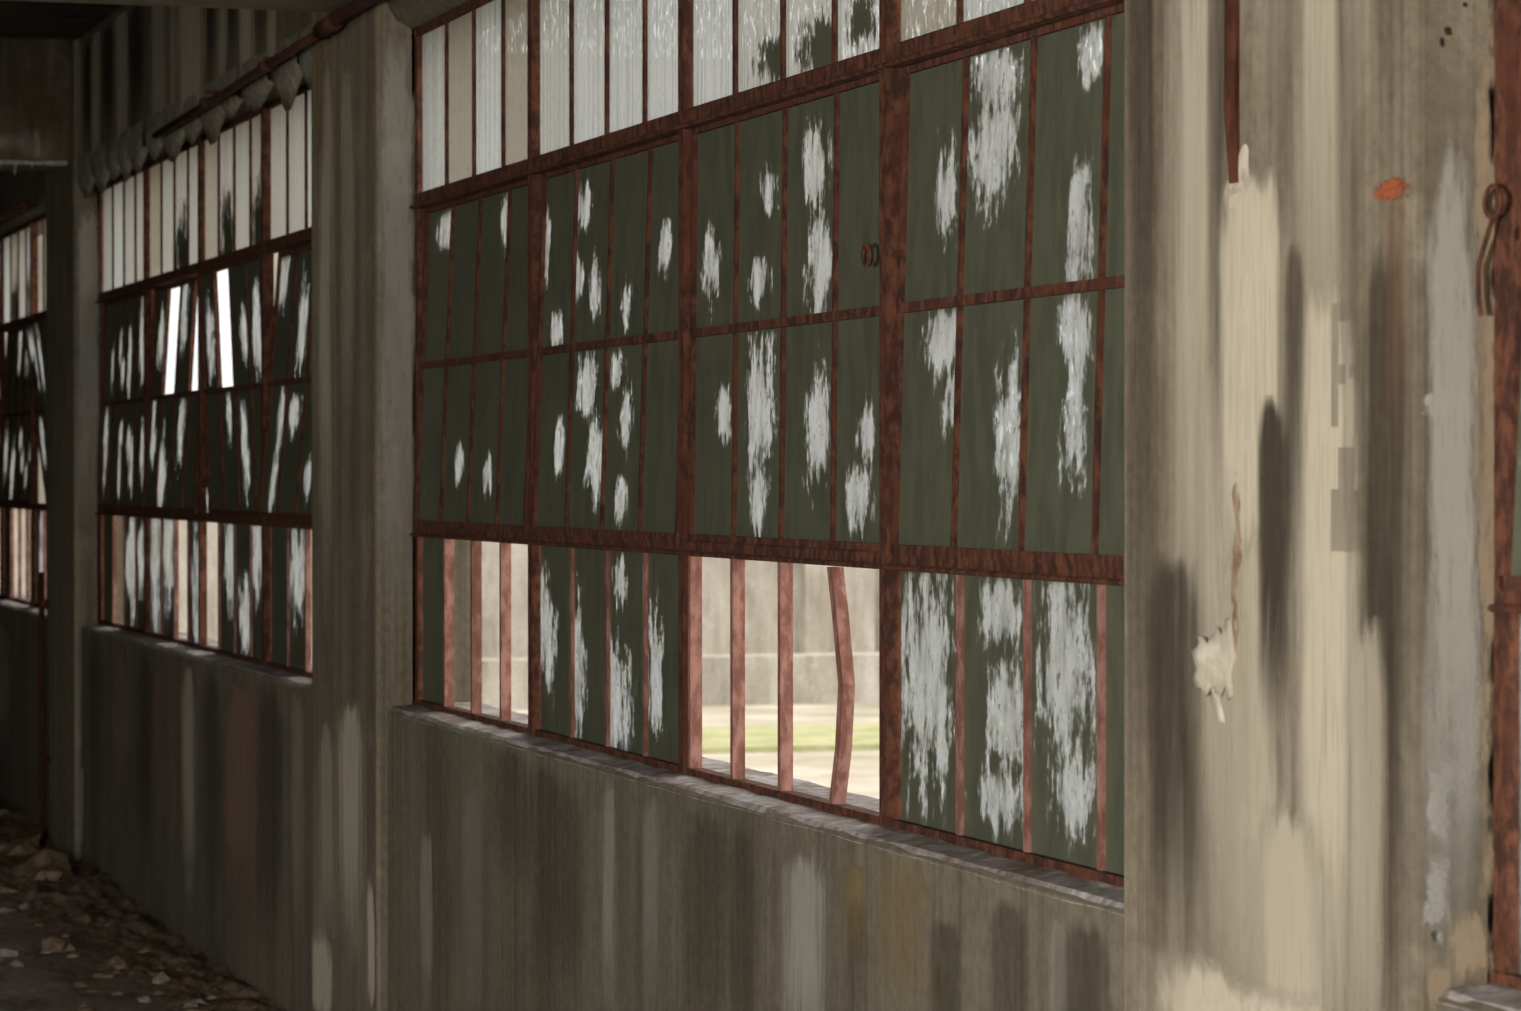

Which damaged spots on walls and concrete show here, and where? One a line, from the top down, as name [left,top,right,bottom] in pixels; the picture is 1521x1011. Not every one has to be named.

damp [0,5,276,166]
damp [319,63,353,510]
damp [1131,0,1149,324]
rust [1374,178,1409,202]
damp [1152,0,1402,1011]
damp [1424,147,1481,837]
damp [181,665,195,863]
damp [321,700,363,940]
damp [421,835,432,977]
damp [603,789,615,970]
damp [784,855,825,1011]
damp [1424,856,1450,940]